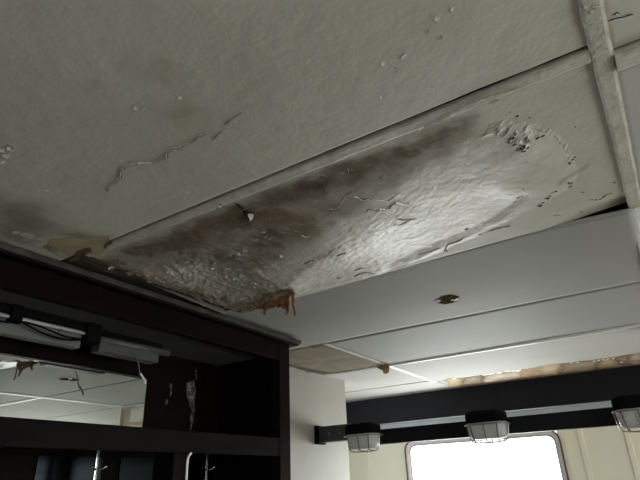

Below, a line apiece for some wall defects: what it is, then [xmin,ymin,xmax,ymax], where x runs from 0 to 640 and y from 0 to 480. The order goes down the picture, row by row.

spalling [451,111,576,165]
peeling [12,231,113,262]
water stain [289,345,382,375]